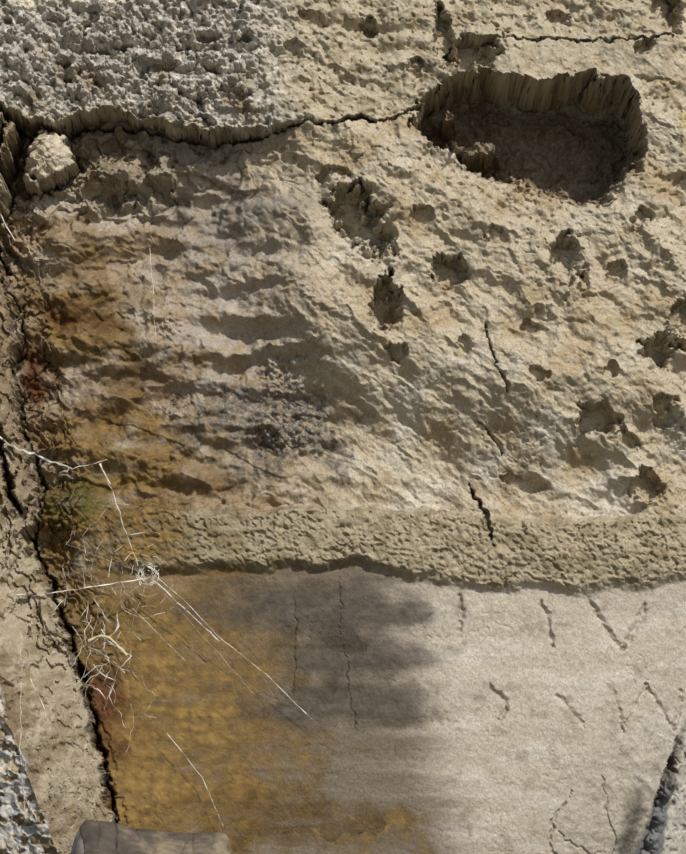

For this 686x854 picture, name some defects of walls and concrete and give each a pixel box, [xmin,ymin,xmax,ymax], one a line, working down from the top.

crack [498,31,674,46]
crack [0,102,413,191]
spalling [0,61,686,520]
crack [484,322,511,393]
damp [38,273,342,580]
crack [475,419,504,457]
crack [0,245,118,823]
crack [468,483,495,546]
damp [61,568,432,854]
crack [547,776,617,854]
damp [619,803,643,854]